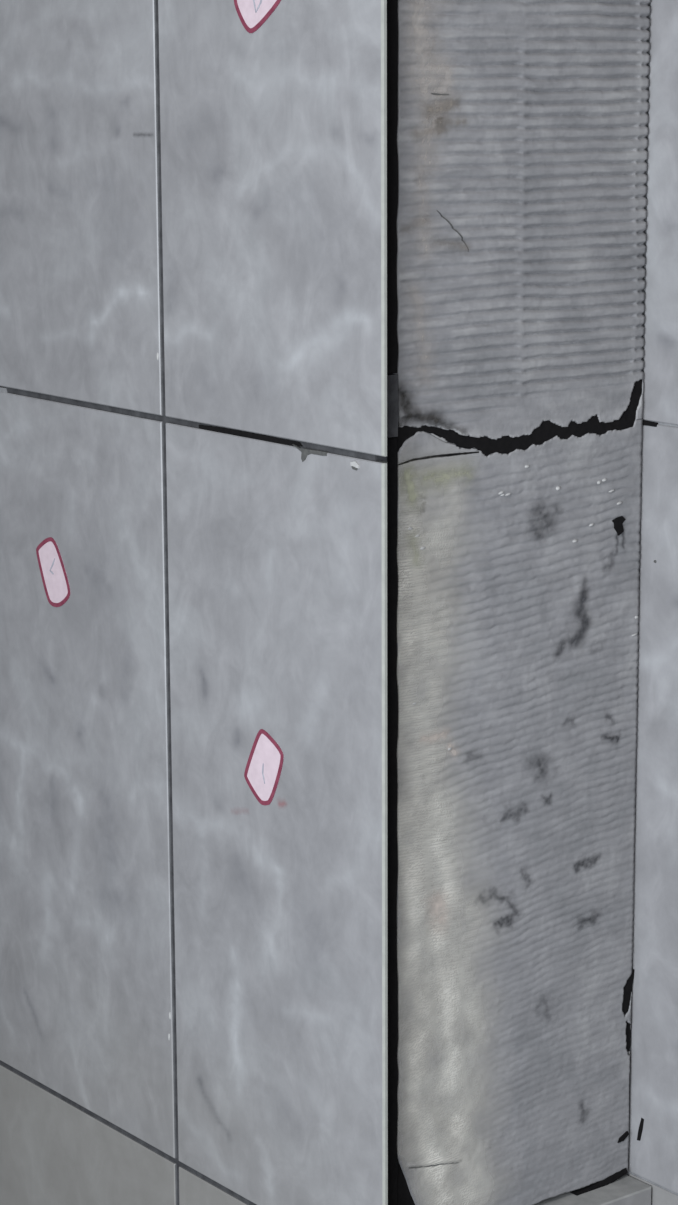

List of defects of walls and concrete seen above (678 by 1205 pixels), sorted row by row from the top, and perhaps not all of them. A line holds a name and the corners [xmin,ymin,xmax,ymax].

crack [391,379,642,465]
leakage [557,592,589,655]